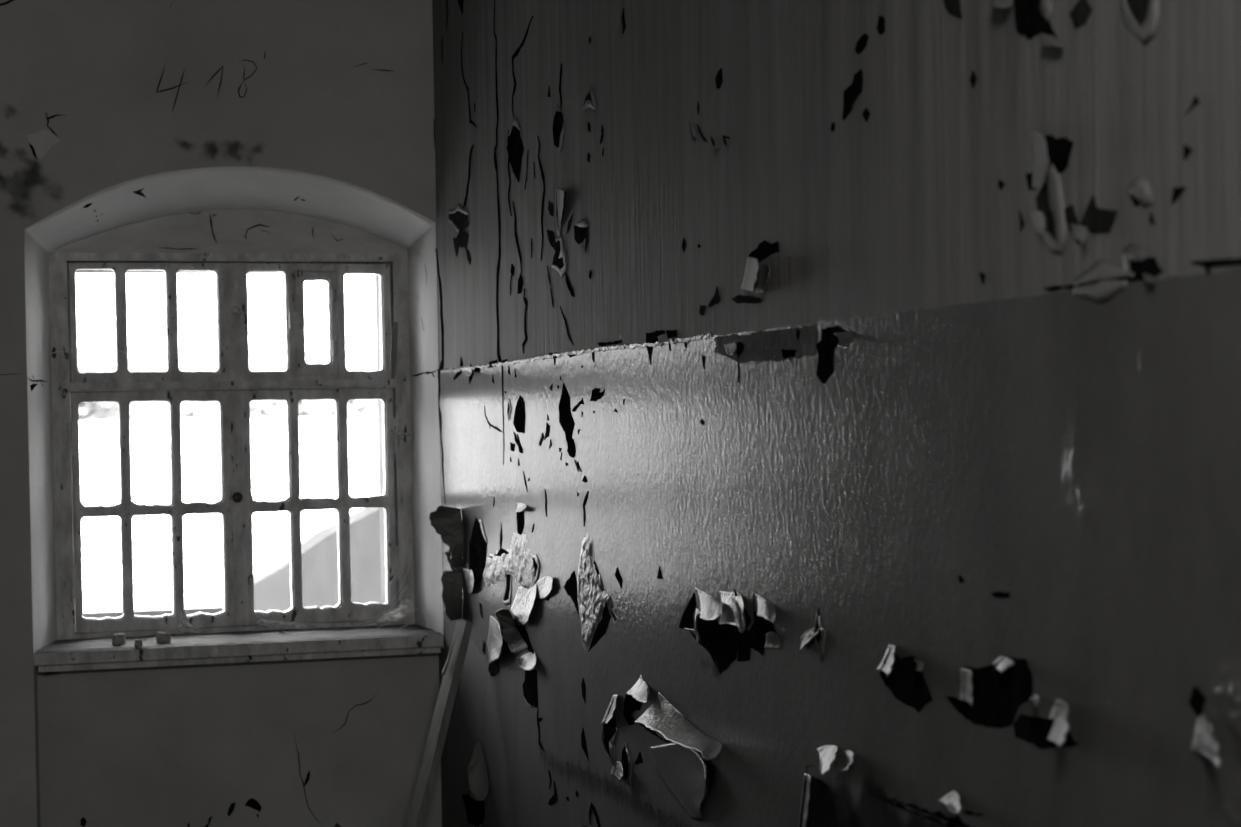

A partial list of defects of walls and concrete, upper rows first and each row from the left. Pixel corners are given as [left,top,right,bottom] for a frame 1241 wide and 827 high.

peeling [991,0,1064,47]
peeling [547,188,589,278]
peeling [699,240,779,315]
peeling [1019,127,1118,254]
peeling [440,325,854,535]
peeling [429,506,579,708]
peeling [588,561,623,652]
peeling [679,588,782,674]
peeling [877,644,1079,749]
peeling [601,675,722,820]
peeling [799,745,854,827]
peeling [1190,715,1222,770]